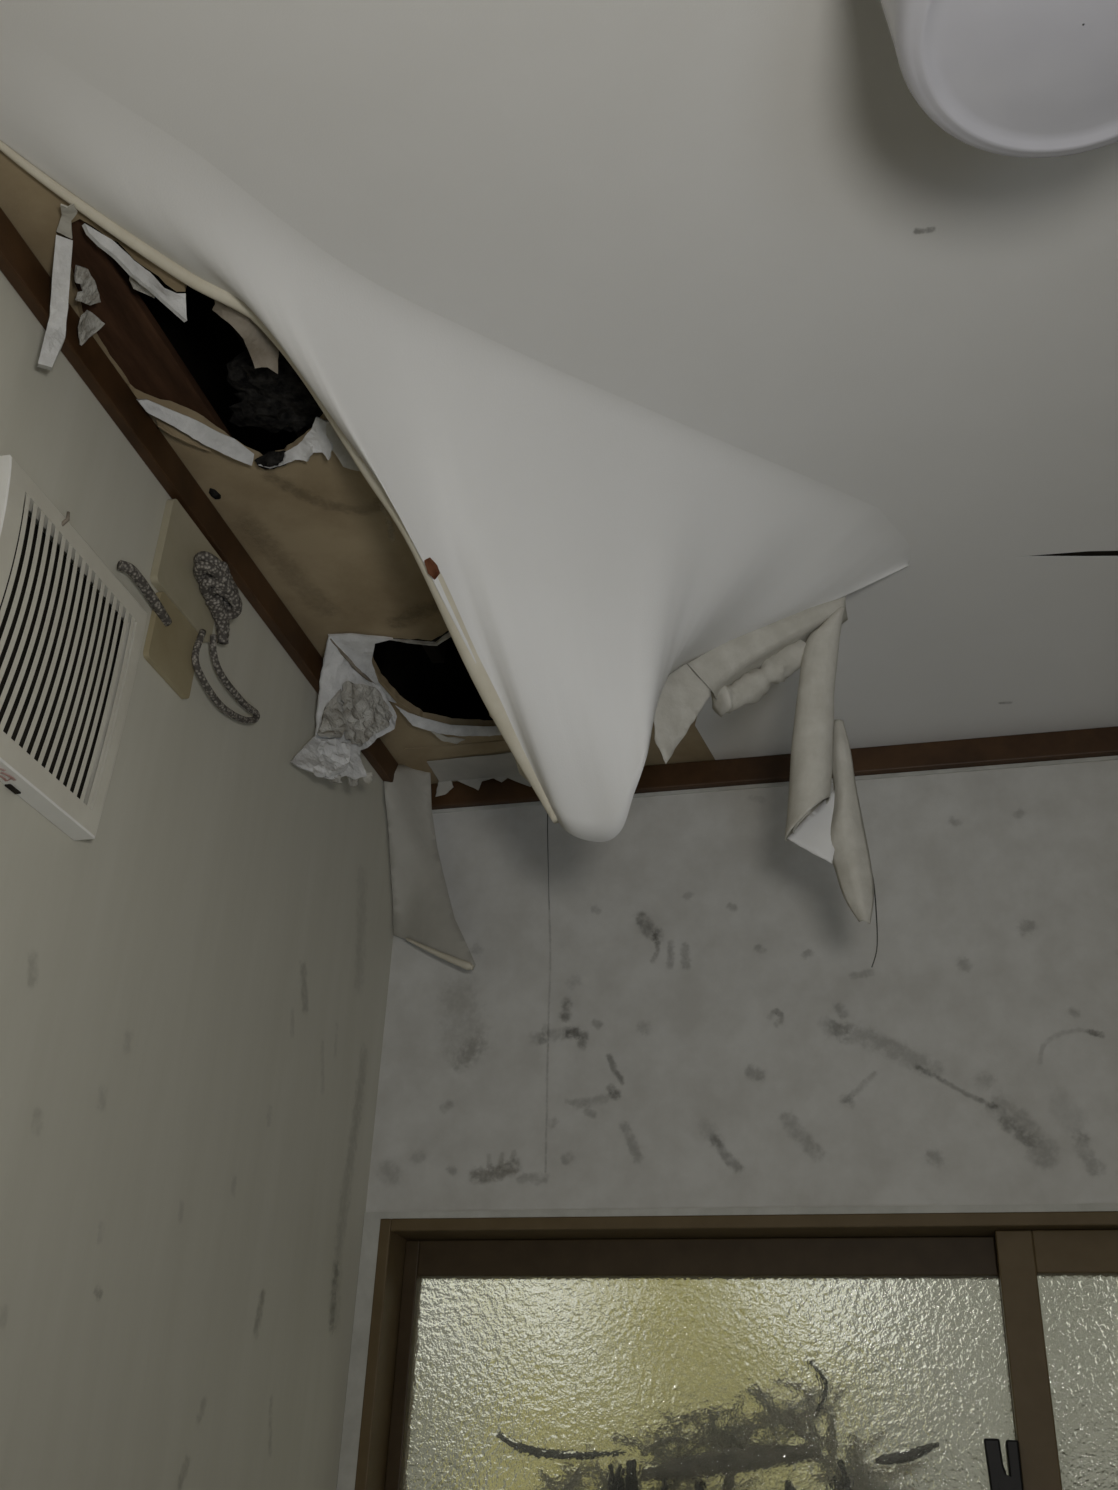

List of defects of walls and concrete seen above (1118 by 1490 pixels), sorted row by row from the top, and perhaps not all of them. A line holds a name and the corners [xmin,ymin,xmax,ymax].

peeling [0,151,451,658]
crack [1032,549,1118,557]
peeling [372,656,511,970]
peeling [644,717,715,766]